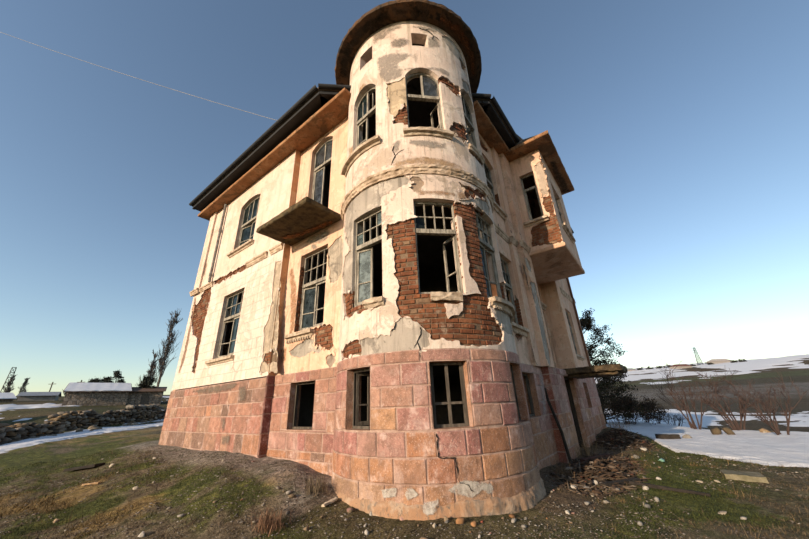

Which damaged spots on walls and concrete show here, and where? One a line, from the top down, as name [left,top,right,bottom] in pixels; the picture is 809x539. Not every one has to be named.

peeling [385,78,408,125]
flaking render [438,75,472,97]
flaking render [449,122,484,168]
flaking render [530,157,564,247]
flaking render [290,176,524,367]
flaking render [190,266,247,372]
peeling [260,261,282,375]
crack [436,433,474,492]